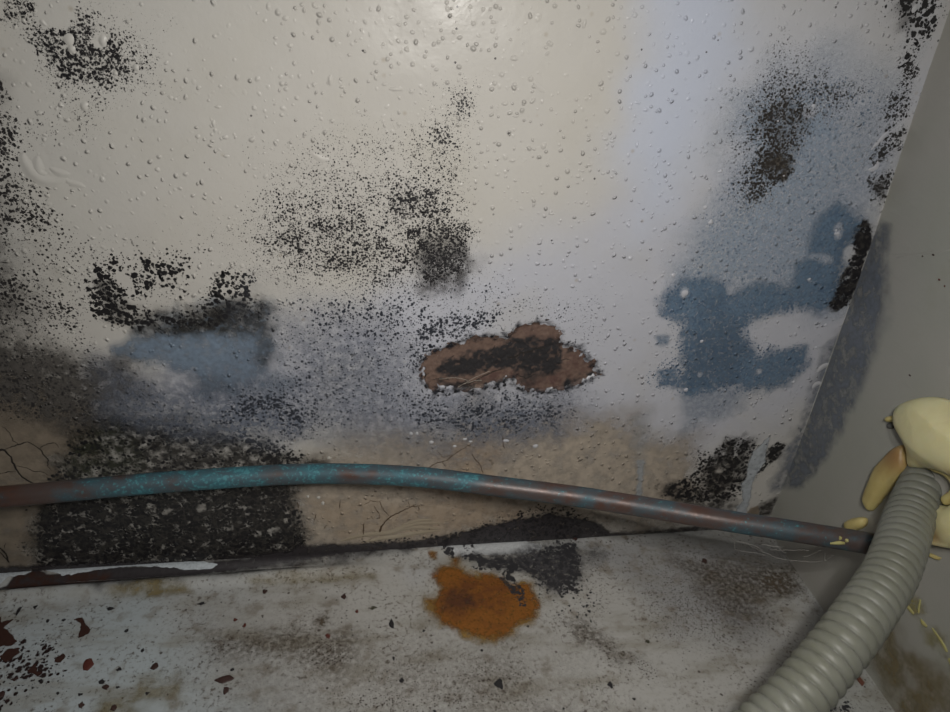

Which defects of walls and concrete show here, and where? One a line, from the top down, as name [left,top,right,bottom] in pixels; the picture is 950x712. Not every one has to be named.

leakage [0,0,945,516]
peeling [418,319,602,399]
crack [0,428,59,483]
leakage [0,484,713,629]
spalling [0,617,19,662]
spalling [74,618,90,638]
corrosion [424,559,539,642]